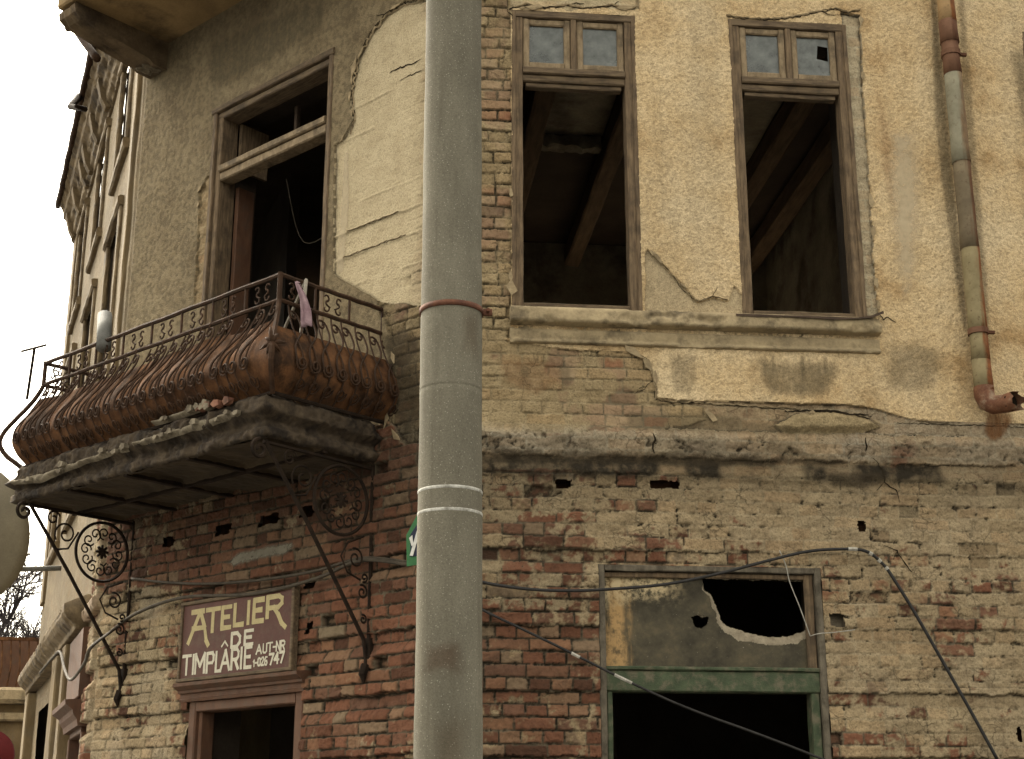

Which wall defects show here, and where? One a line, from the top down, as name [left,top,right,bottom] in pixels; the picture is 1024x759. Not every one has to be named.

crack [726,7,861,21]
crack [350,0,422,134]
spalling [481,0,717,434]
flaking render [644,250,742,313]
spalling [11,396,241,485]
spalling [555,479,572,489]
water stain [493,450,790,465]
spalling [650,480,680,490]
crack [636,355,900,503]